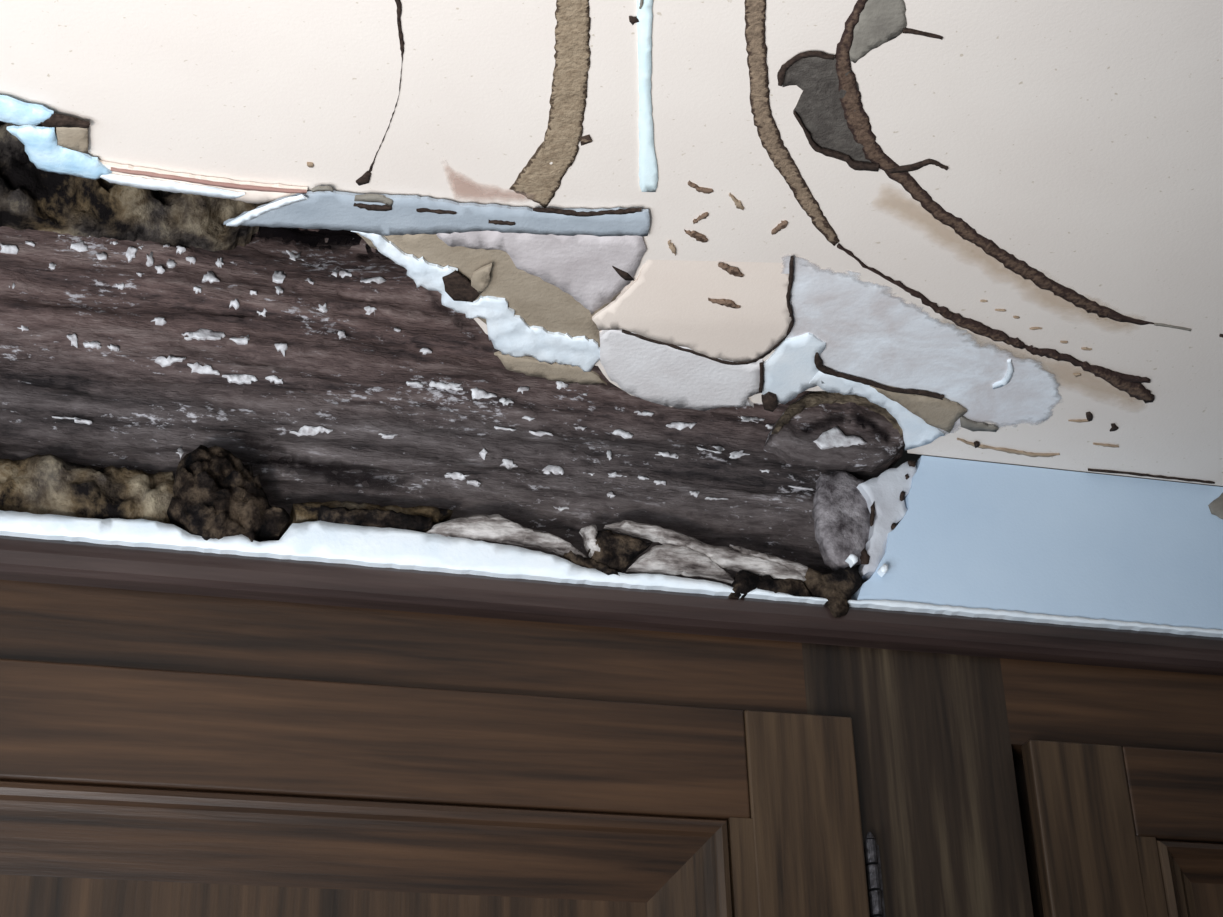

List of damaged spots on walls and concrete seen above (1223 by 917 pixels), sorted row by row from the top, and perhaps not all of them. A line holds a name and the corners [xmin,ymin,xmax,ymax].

crack [902,28,943,40]
crack [356,0,404,186]
peeling [0,95,112,180]
crack [888,159,948,173]
spalling [688,180,713,194]
peeling [0,241,35,254]
peeling [58,235,196,277]
peeling [193,258,224,294]
peeling [67,333,119,351]
peeling [181,328,250,345]
peeling [155,355,283,384]
flaking render [223,186,1060,582]